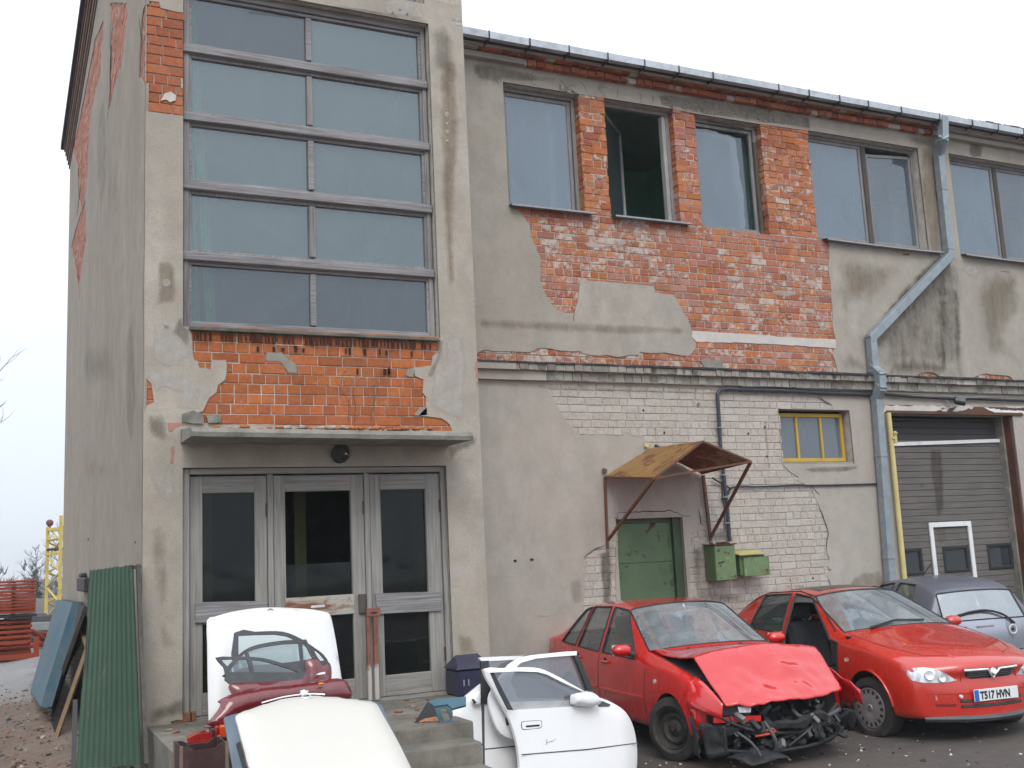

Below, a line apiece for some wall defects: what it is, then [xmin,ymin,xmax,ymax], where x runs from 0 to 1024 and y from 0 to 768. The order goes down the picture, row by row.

flaking render [72,3,128,295]
flaking render [140,1,185,116]
flaking render [168,326,452,432]
flaking render [475,46,1024,641]